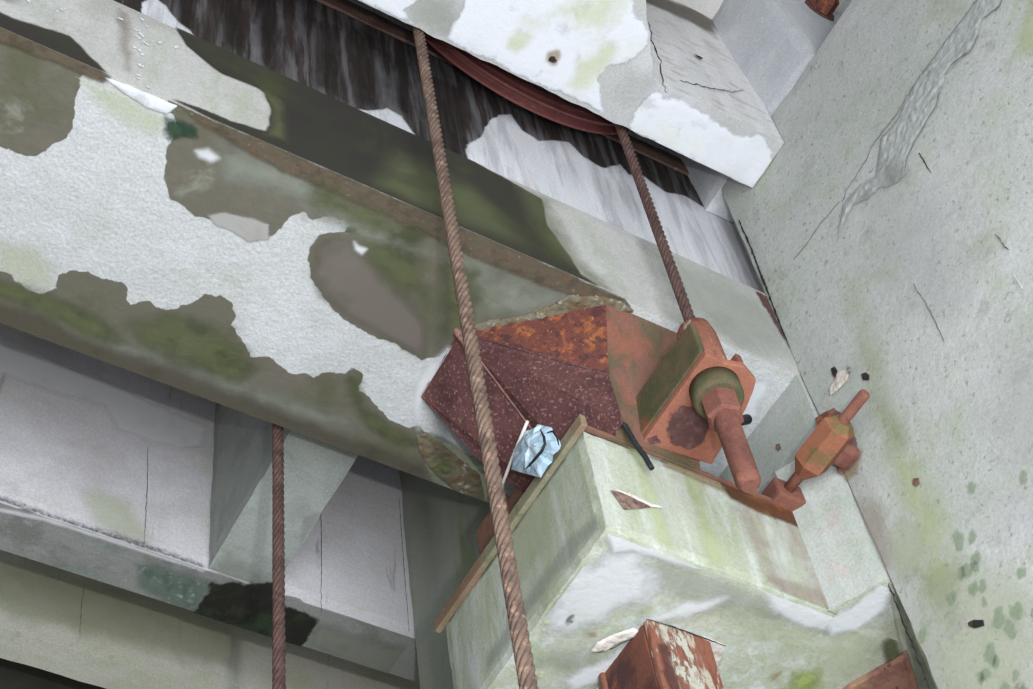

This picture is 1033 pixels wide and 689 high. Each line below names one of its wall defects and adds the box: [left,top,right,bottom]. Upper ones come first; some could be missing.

peeling [362,0,417,24]
water stain [646,0,714,32]
peeling [448,0,649,113]
peeling [106,78,177,114]
peeling [629,92,773,187]
water stain [0,0,703,482]
peeling [0,338,205,447]
water stain [0,498,205,572]
water stain [194,582,317,647]